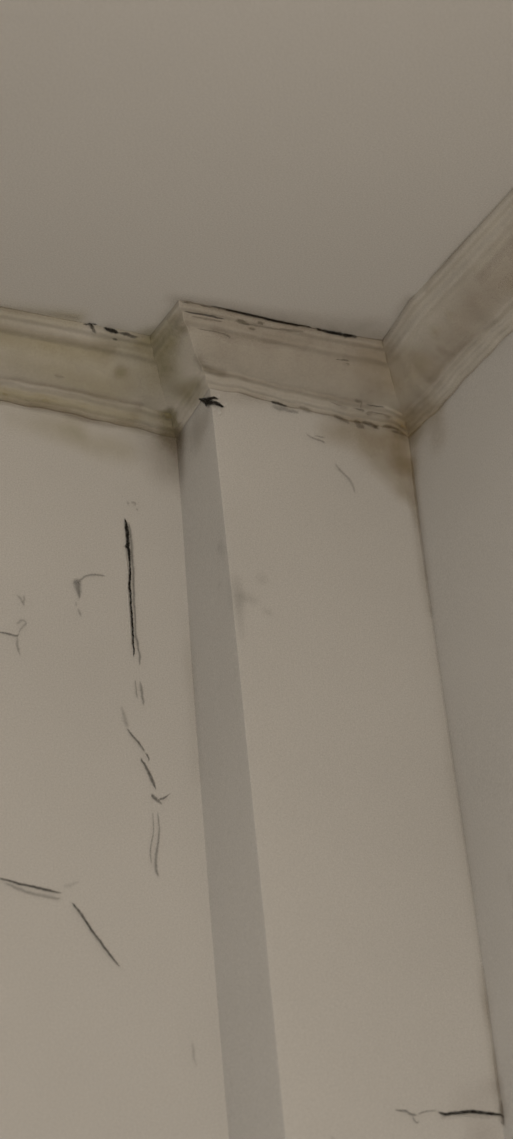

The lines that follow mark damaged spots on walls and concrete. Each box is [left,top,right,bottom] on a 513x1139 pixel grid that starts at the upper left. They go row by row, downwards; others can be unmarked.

crack [186,306,356,337]
crack [123,519,135,655]
crack [130,733,167,800]
crack [0,878,119,966]
crack [398,1110,503,1123]